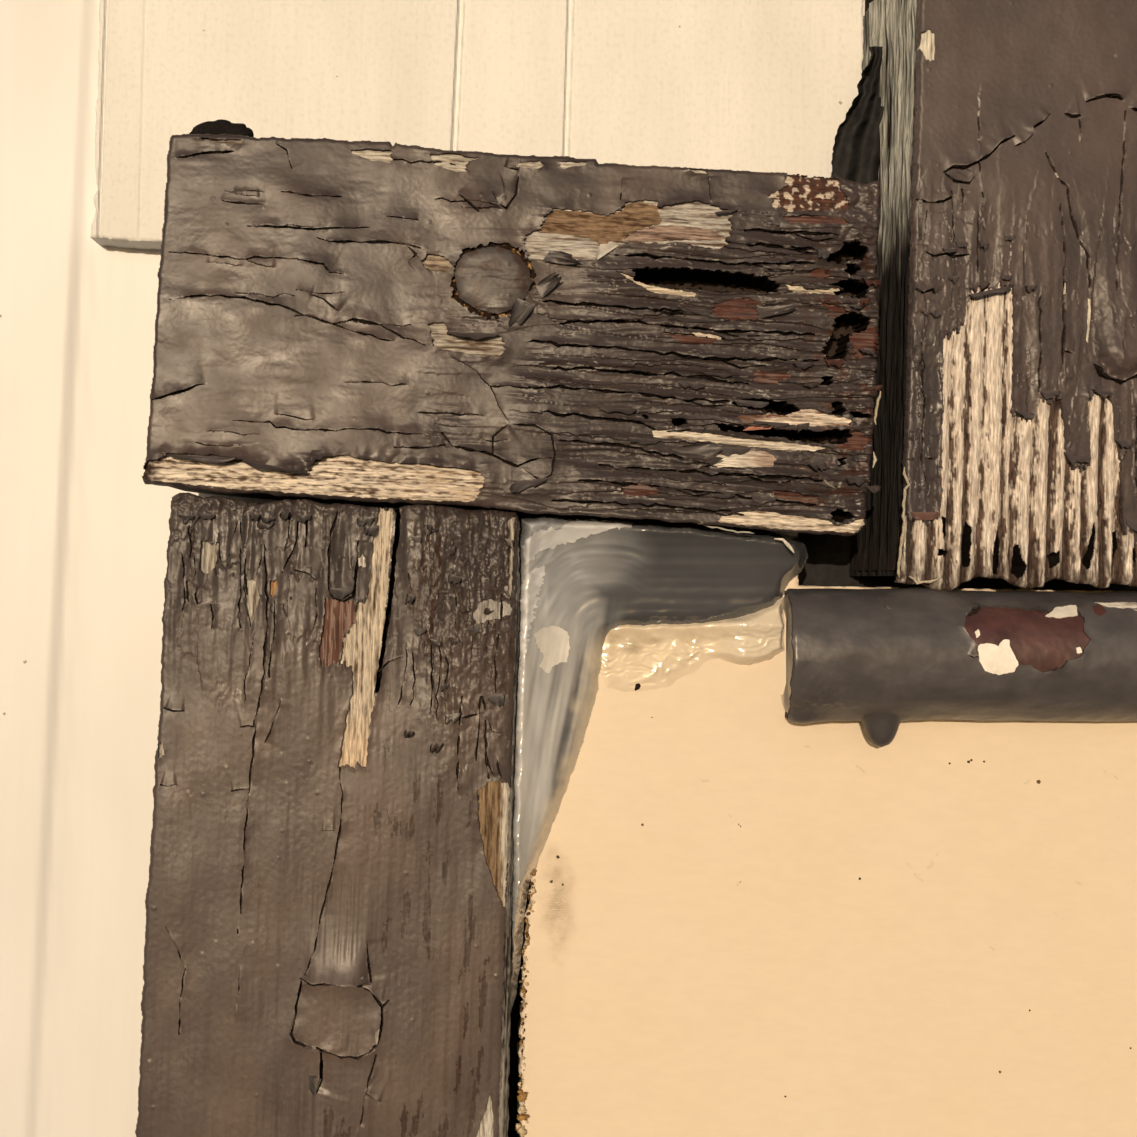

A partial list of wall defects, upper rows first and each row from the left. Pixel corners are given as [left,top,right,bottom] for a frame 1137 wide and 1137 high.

crack [169,145,519,345]
peeling [524,200,738,265]
crack [916,94,1137,294]
crack [182,511,359,933]
peeling [143,453,485,768]
crack [398,593,503,789]
crack [196,243,874,516]
peeling [627,400,872,489]
peeling [710,490,865,533]
peeling [894,275,1137,592]
peeling [964,602,1137,675]
crack [290,766,389,1124]